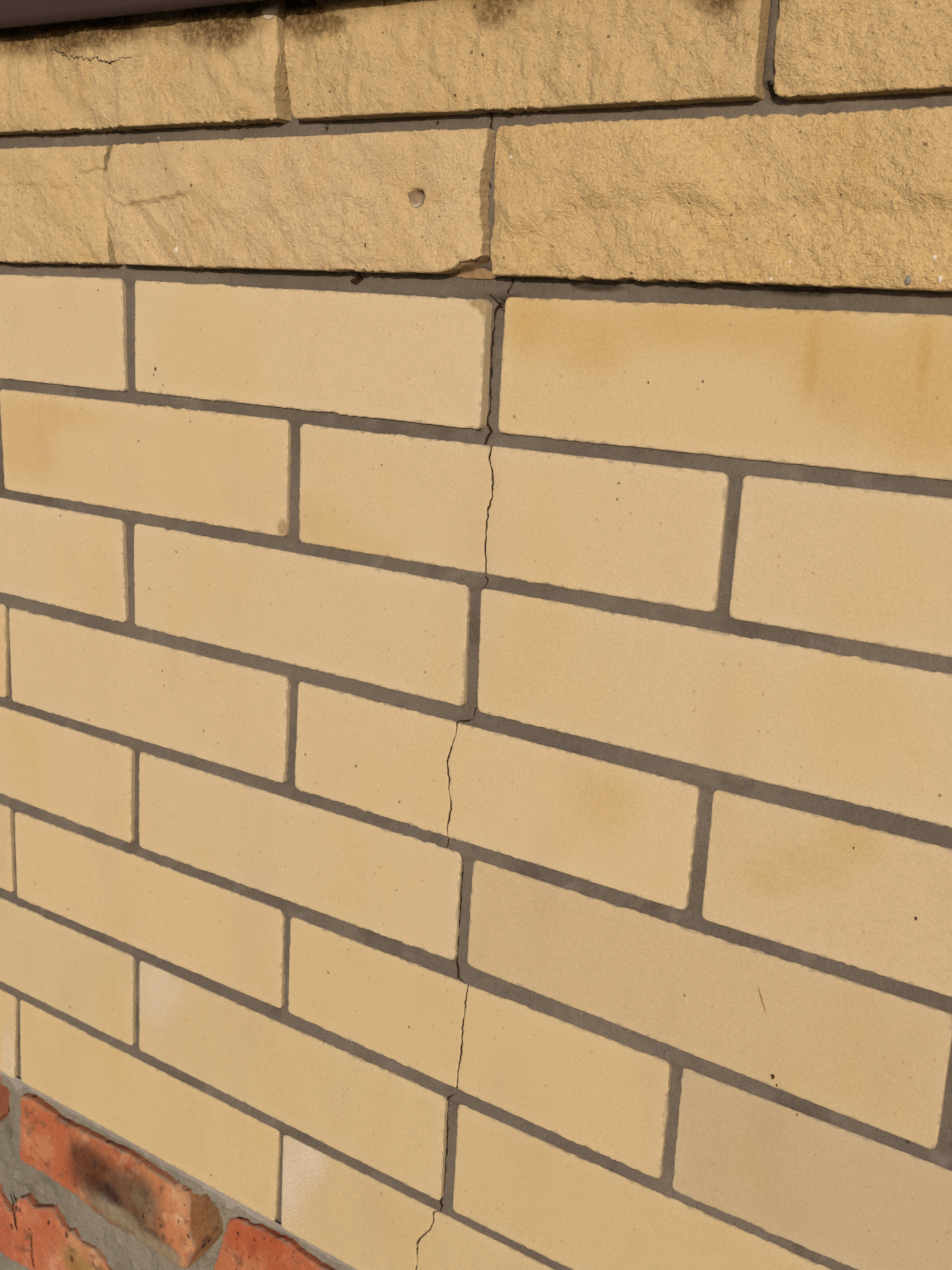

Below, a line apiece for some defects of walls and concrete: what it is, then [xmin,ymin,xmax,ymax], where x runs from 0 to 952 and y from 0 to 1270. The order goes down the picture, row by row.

crack [484,278,514,588]
crack [416,707,476,1270]